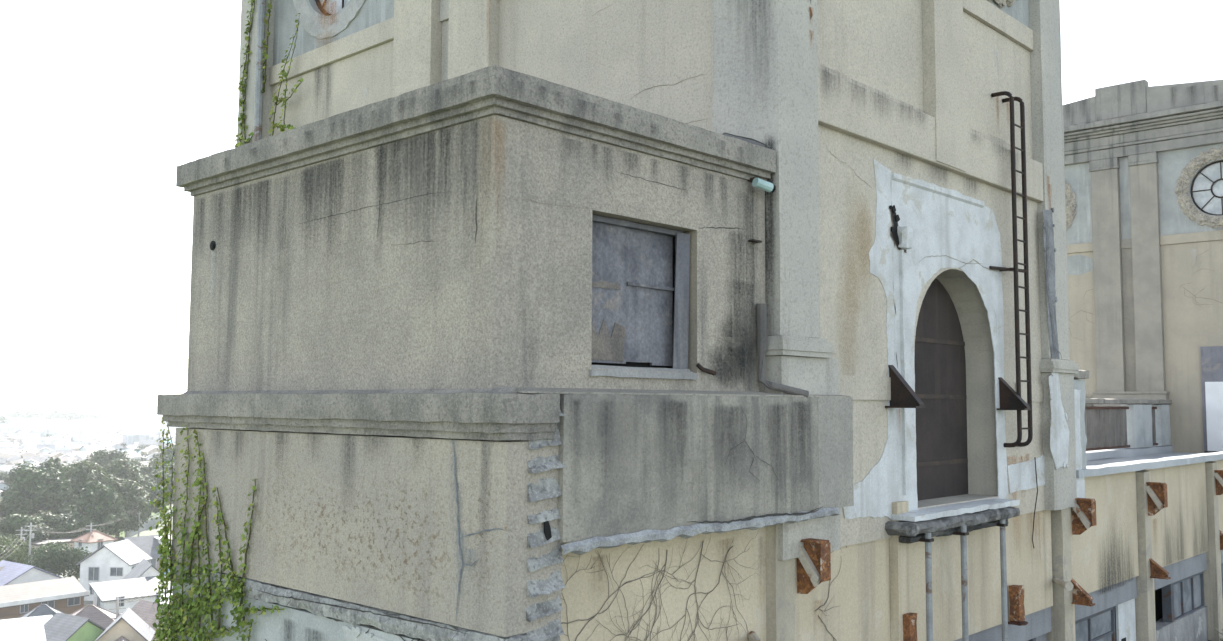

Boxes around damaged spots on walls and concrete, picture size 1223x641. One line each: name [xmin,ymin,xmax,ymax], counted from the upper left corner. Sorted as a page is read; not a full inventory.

spalling [889,205,907,253]
peeling [342,626,387,641]
crack [255,440,503,641]
spalling [509,410,841,641]